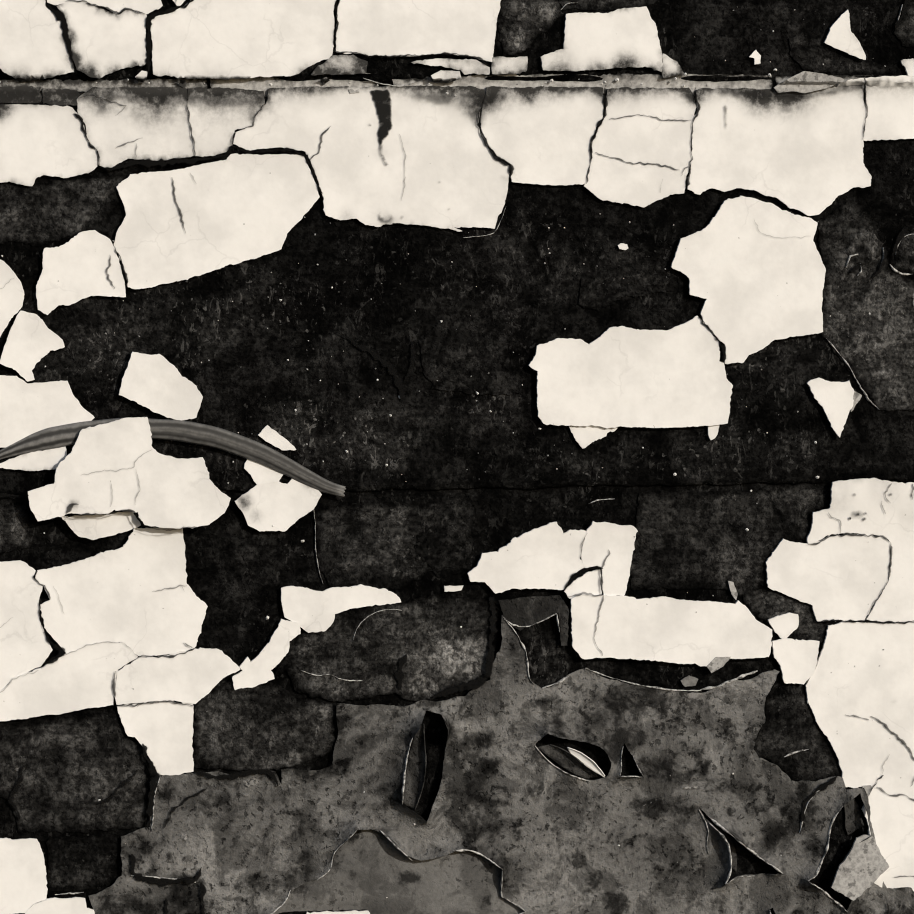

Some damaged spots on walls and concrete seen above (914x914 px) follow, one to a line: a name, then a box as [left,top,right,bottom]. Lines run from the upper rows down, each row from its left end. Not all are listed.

crack [46,0,194,73]
crack [334,1,488,65]
crack [73,95,331,233]
crack [477,108,514,177]
crack [587,87,700,187]
peeling [0,0,914,449]
crack [812,514,912,624]
crack [33,571,65,667]
crack [112,673,195,707]
crack [139,643,195,658]
peeling [0,417,914,914]
crack [846,715,914,801]